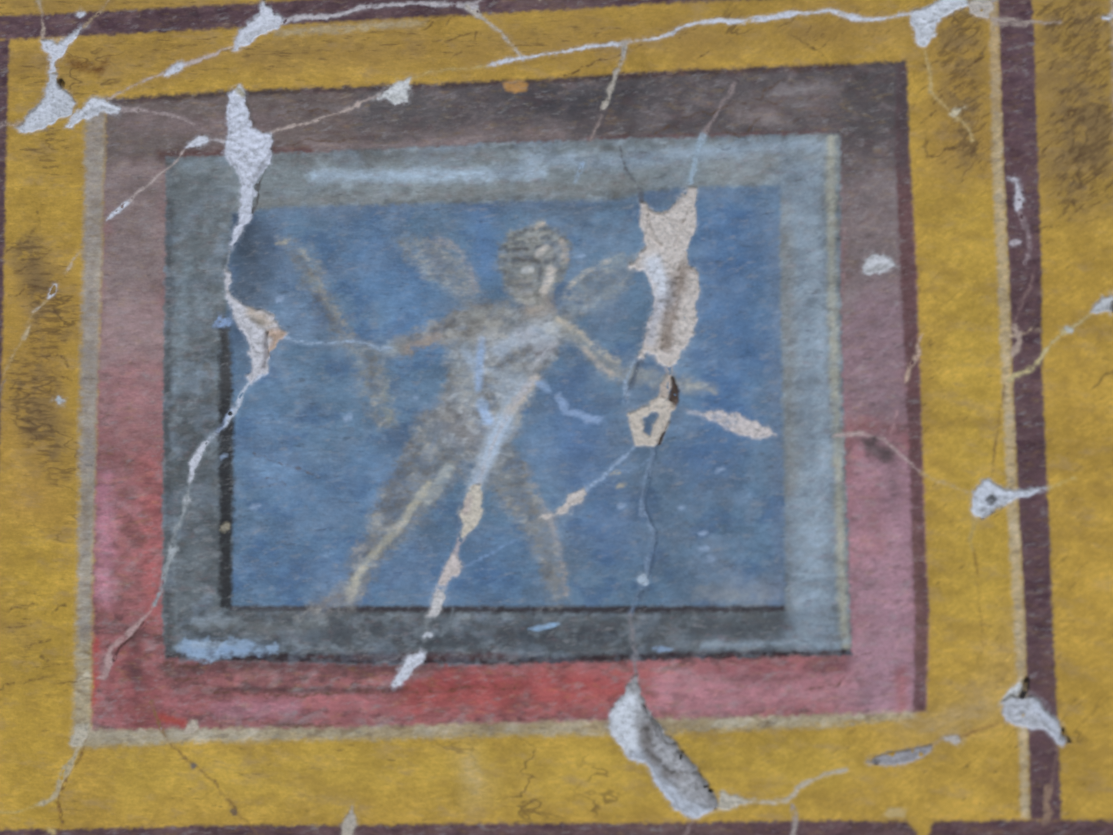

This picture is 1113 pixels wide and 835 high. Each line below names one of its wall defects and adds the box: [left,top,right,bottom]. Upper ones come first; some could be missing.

spalling [0,20,199,137]
crack [103,131,226,225]
crack [103,44,230,102]
spalling [210,81,396,388]
spalling [228,0,528,64]
crack [268,4,909,205]
spalling [623,181,779,450]
spalling [906,0,1065,145]
crack [1003,103,1113,386]
crack [0,364,270,692]
crack [147,339,660,835]
spalling [601,669,1074,835]